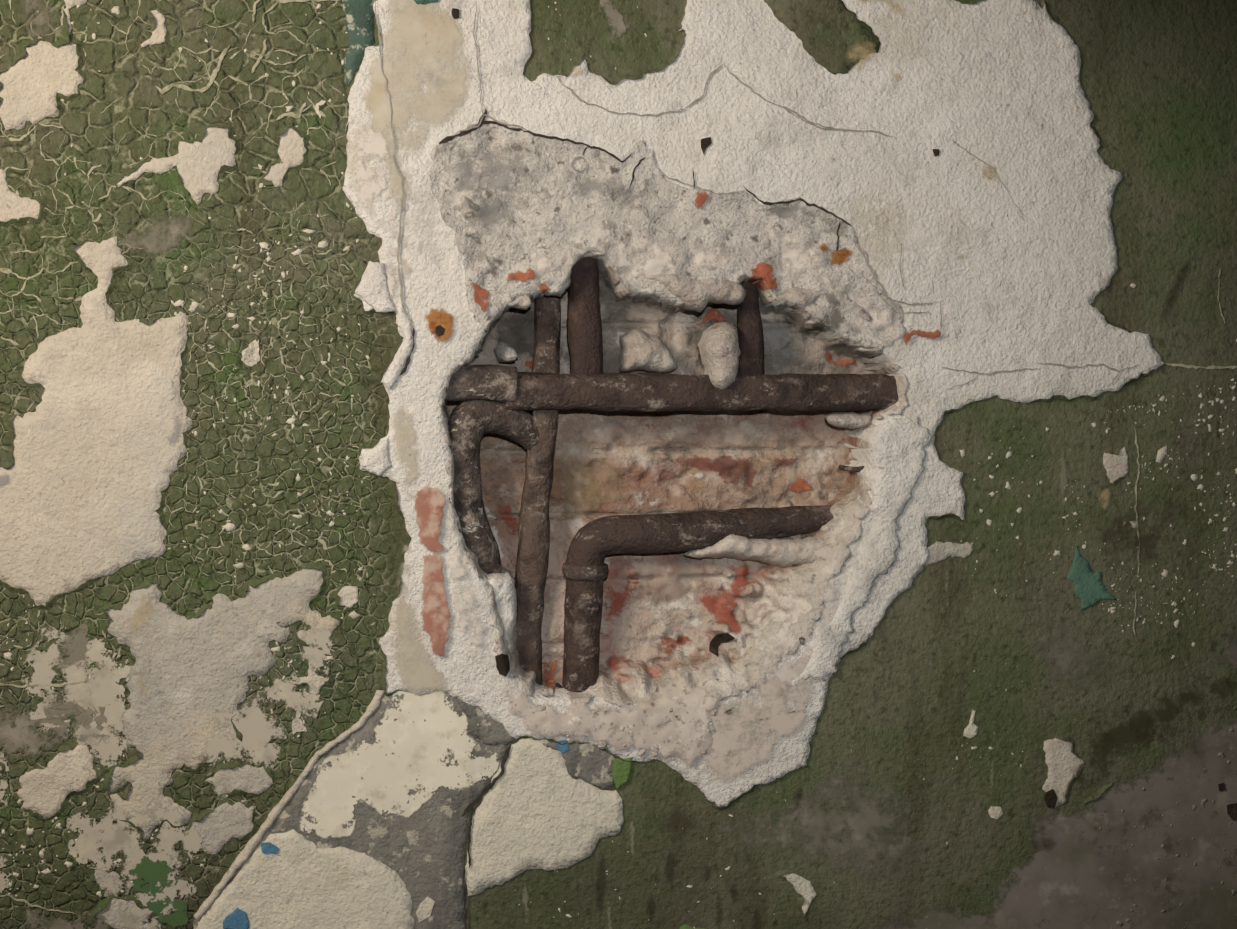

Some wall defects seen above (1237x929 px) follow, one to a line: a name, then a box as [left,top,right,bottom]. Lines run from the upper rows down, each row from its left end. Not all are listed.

peeling [0,168,47,227]
peeling [0,0,120,130]
crack [0,0,349,345]
peeling [115,118,240,205]
crack [375,0,415,383]
crack [439,2,1237,390]
peeling [0,236,201,612]
crack [165,203,376,689]
peeling [193,0,1164,929]
peeling [1091,378,1237,586]
peeling [0,562,363,929]
peeling [870,706,1237,929]